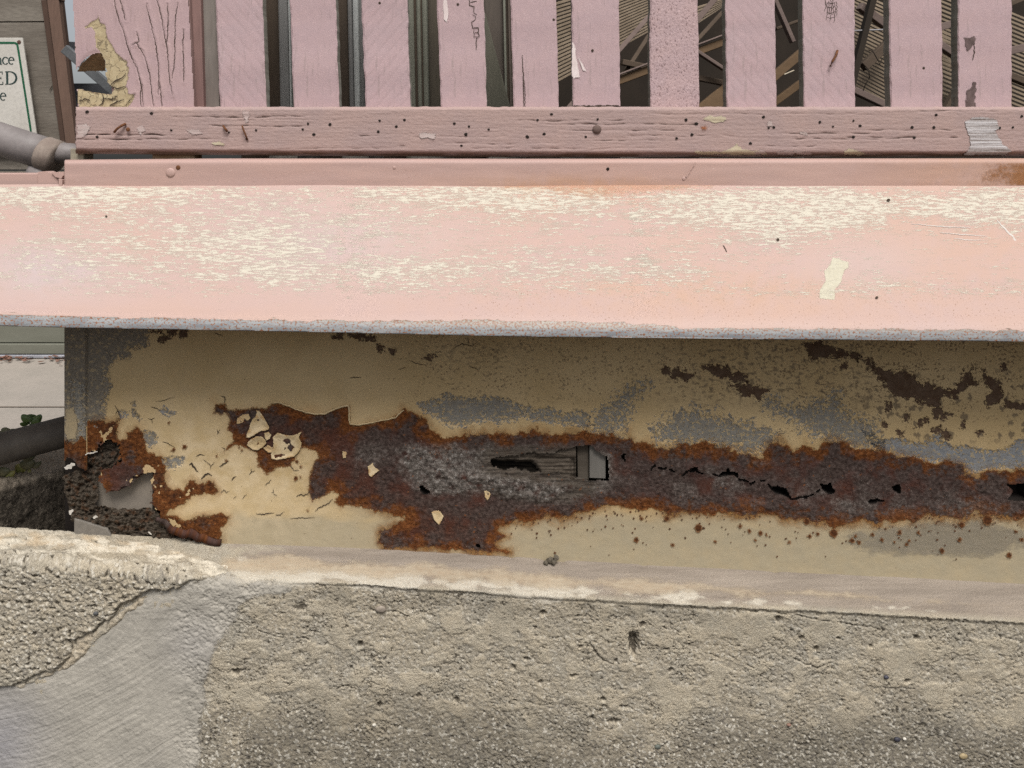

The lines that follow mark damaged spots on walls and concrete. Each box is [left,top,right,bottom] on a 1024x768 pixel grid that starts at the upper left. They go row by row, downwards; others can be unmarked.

peeling [964,117,1011,156]
peeling [0,186,1024,309]
rust [64,418,231,547]
peeling [162,455,185,470]
peeling [237,410,302,460]
rust [212,403,1024,556]
peeling [416,340,1024,473]
crack [650,465,820,500]